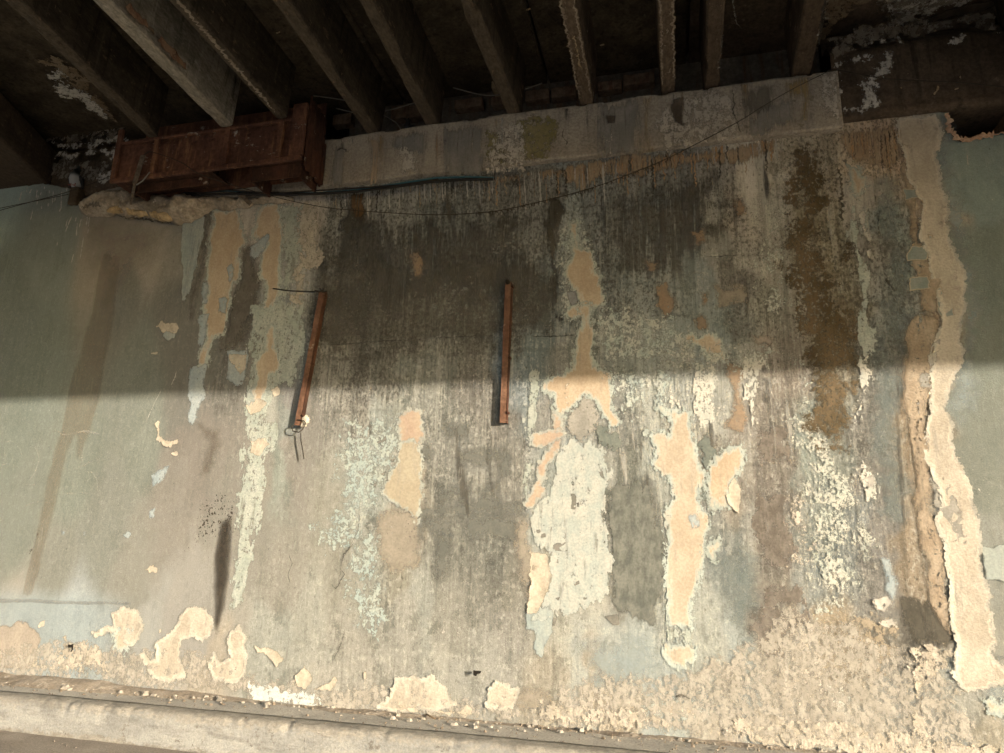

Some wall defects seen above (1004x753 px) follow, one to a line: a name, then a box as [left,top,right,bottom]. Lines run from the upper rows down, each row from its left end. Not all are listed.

water stain [19,55,128,221]
water stain [329,109,567,325]
water stain [646,0,1000,153]
peeling [78,189,325,685]
flaking render [308,406,426,642]
water stain [0,143,975,753]
peeling [515,192,749,672]
flaking render [726,112,1004,753]
flaking render [0,606,214,683]
flaking render [295,665,337,691]
flaking render [376,673,472,716]
flaking render [484,679,722,732]